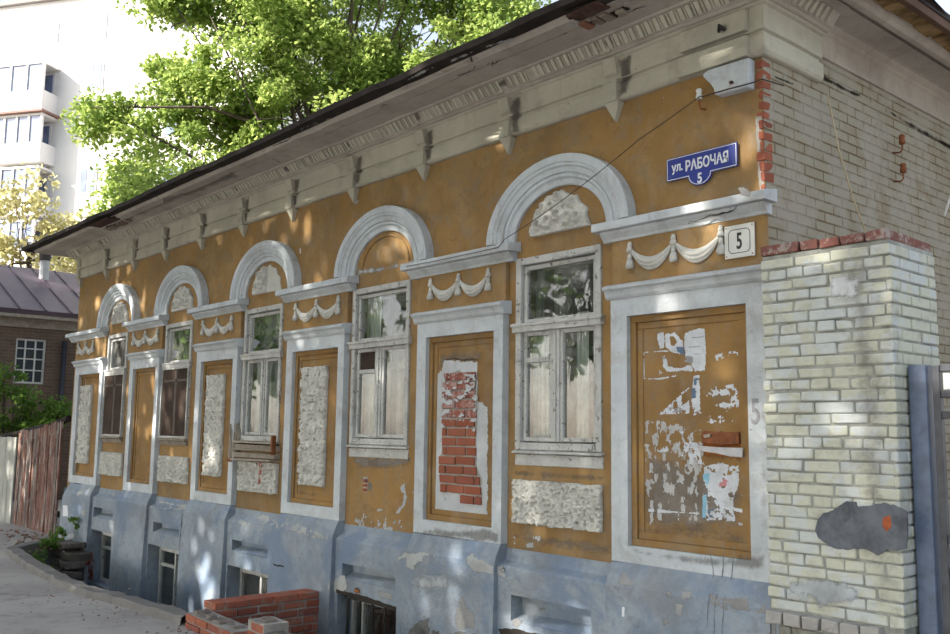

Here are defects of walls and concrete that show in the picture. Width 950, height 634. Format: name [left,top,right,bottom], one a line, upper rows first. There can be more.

spalling [564,0,633,30]
water stain [620,56,631,94]
water stain [511,98,521,131]
crack [688,206,737,224]
flaking render [435,360,489,515]
peeling [408,618,439,634]